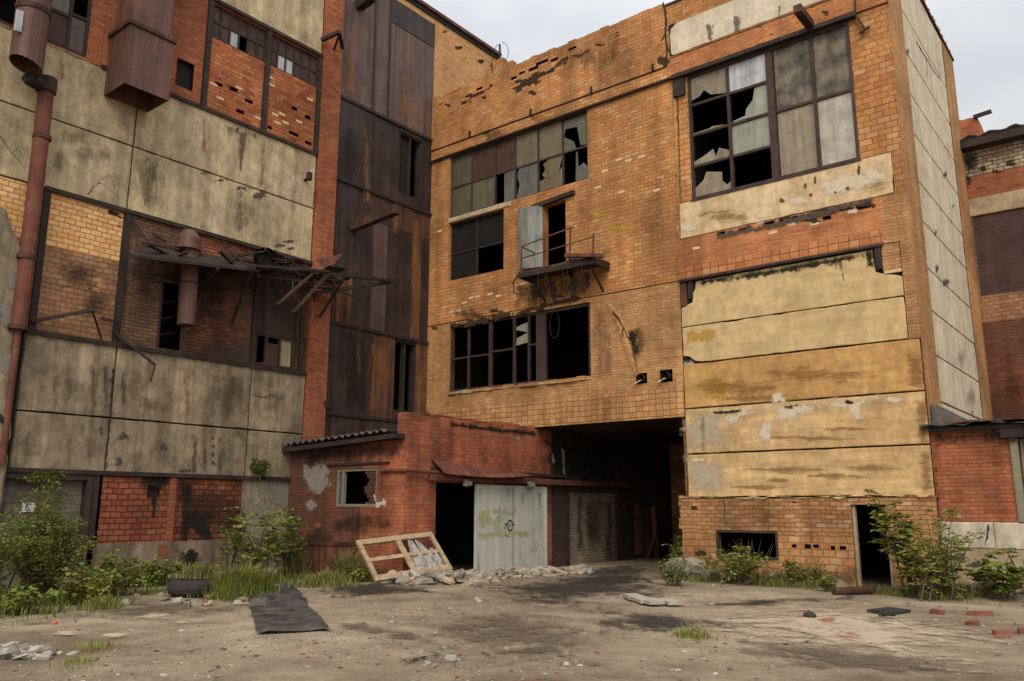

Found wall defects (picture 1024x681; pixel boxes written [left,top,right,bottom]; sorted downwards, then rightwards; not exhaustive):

spalling [439,84,492,107]
spalling [511,32,619,95]
water stain [226,126,257,170]
peeling [716,163,890,239]
crack [612,311,639,376]
peeling [678,391,902,529]
peeling [301,459,332,529]
water stain [187,512,212,565]